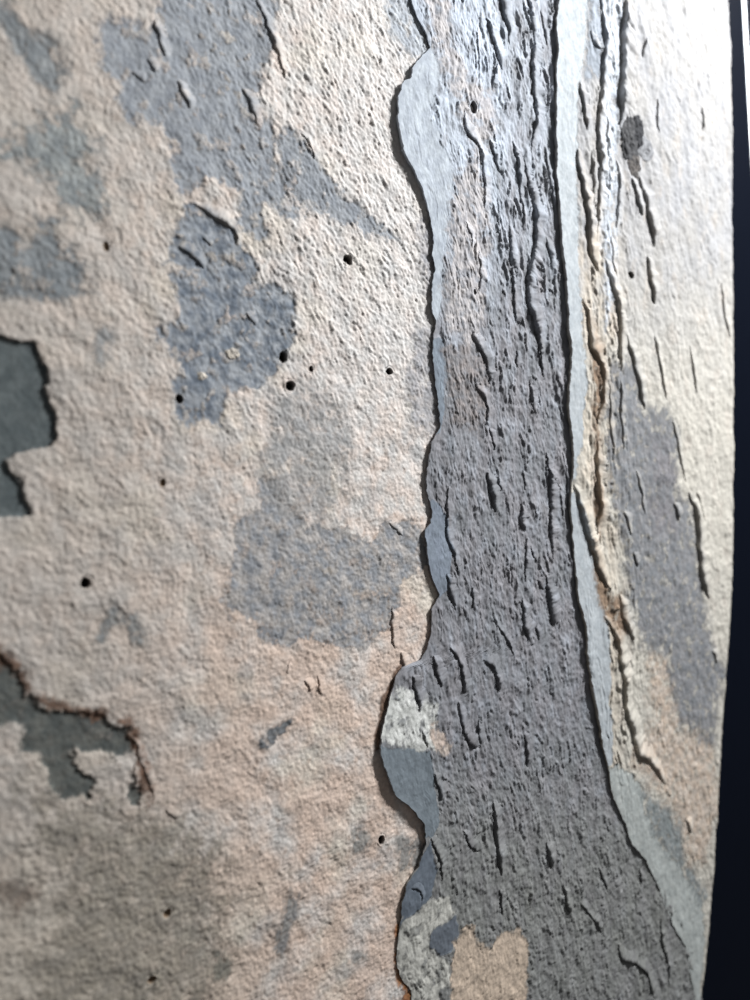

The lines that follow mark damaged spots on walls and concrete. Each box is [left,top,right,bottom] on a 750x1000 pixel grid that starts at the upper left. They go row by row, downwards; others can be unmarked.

crack [721,283,731,337]
crack [389,0,711,785]
spalling [0,336,56,517]
peeling [379,0,735,1000]
crack [711,647,719,664]
spalling [0,665,133,800]
spalling [127,784,141,806]
crack [434,772,448,800]
crack [685,816,693,834]